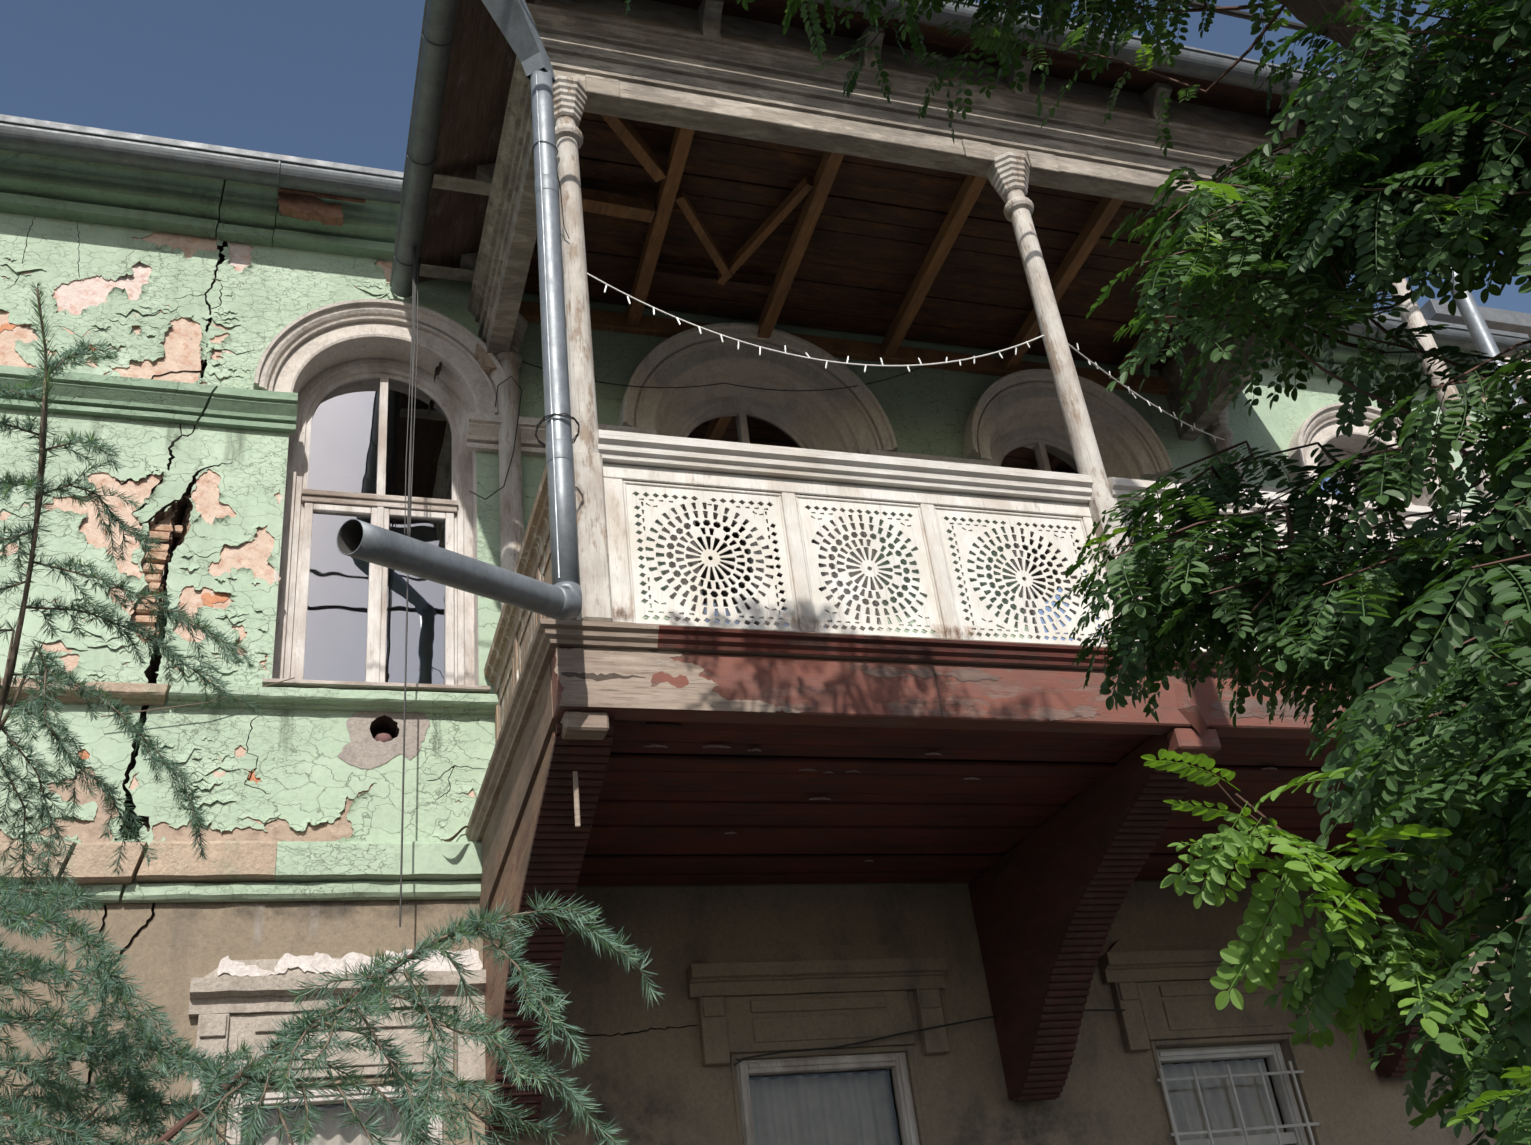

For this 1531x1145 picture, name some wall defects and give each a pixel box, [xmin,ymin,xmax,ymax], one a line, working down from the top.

peeling [0,231,259,389]
crack [151,241,228,384]
peeling [0,468,281,682]
crack [114,424,233,841]
peeling [554,646,801,727]
peeling [861,667,1000,682]
peeling [1039,705,1101,721]
peeling [1210,693,1315,718]
peeling [0,735,377,843]
crack [244,717,267,794]
peeling [432,782,482,842]
peeling [217,948,483,976]